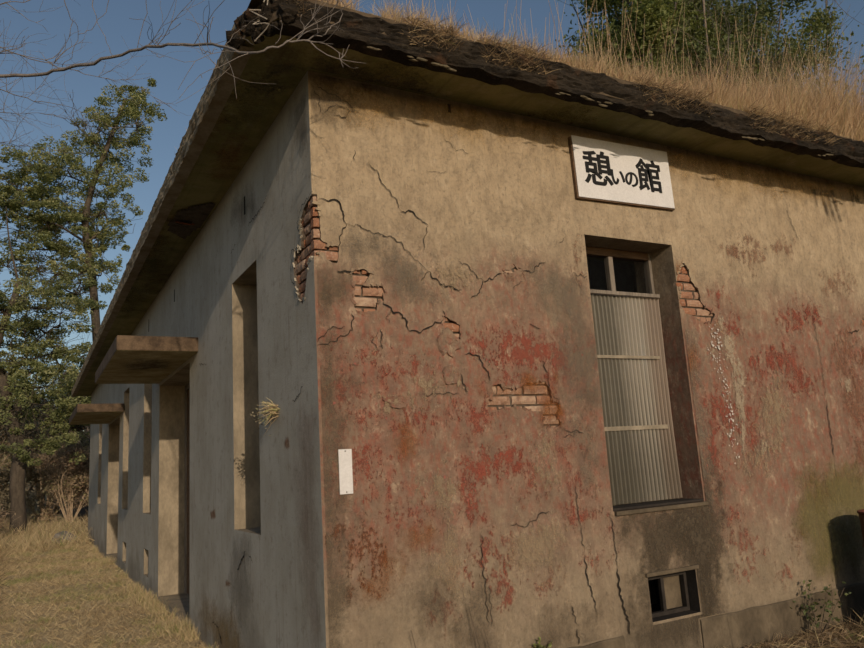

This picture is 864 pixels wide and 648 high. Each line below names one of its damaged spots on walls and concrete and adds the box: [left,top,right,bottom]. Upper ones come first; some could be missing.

flaking render [293,196,338,302]
crack [317,311,354,345]
flaking render [350,267,386,316]
crack [372,302,446,350]
crack [290,152,546,298]
peeling [676,261,824,491]
peeling [322,313,618,630]
crack [481,537,493,627]
crack [572,485,598,643]
crack [609,517,630,634]
damp [801,469,864,573]